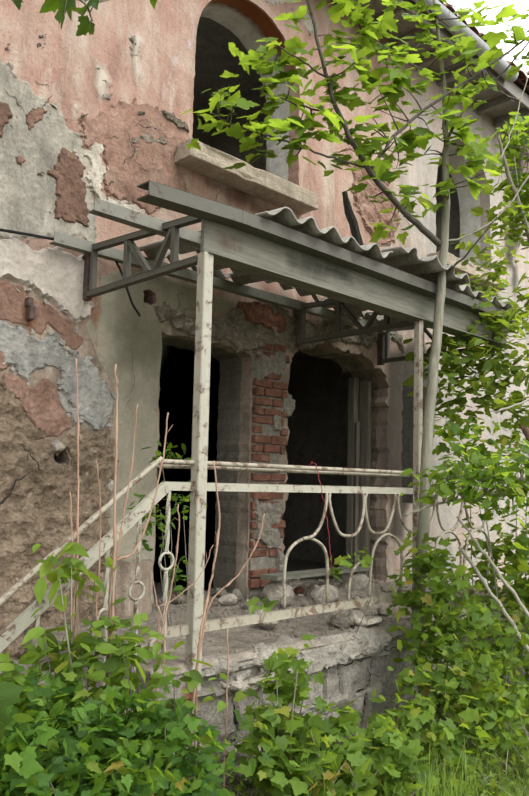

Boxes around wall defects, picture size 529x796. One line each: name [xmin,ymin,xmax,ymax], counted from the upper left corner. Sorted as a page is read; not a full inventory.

flaking render [0,44,145,633]
flaking render [154,302,196,337]
flaking render [211,301,378,354]
crack [0,443,44,505]
flaking render [1,546,114,660]